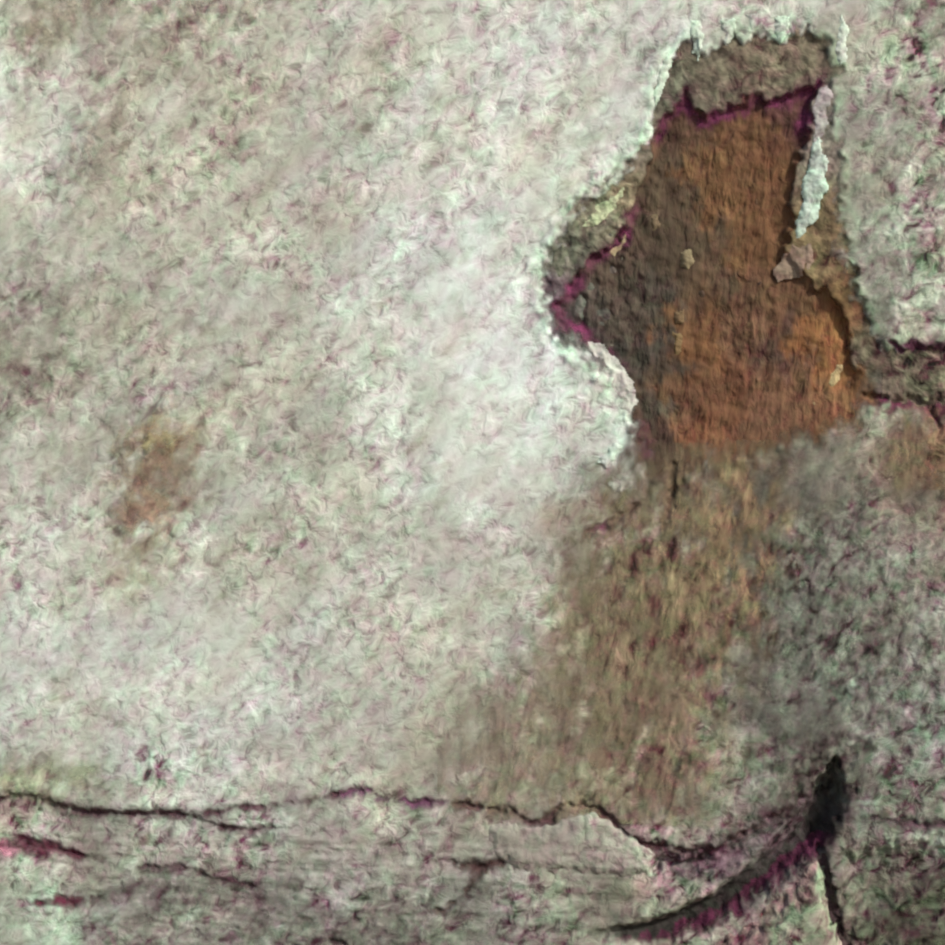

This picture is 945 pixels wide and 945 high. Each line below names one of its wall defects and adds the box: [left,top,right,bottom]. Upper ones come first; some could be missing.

flaking render [542,12,945,494]
water stain [655,492,912,880]
crack [0,790,275,834]
crack [0,835,85,858]
crack [138,862,256,890]
crack [308,767,853,945]
crack [34,894,101,907]
crack [288,937,346,945]